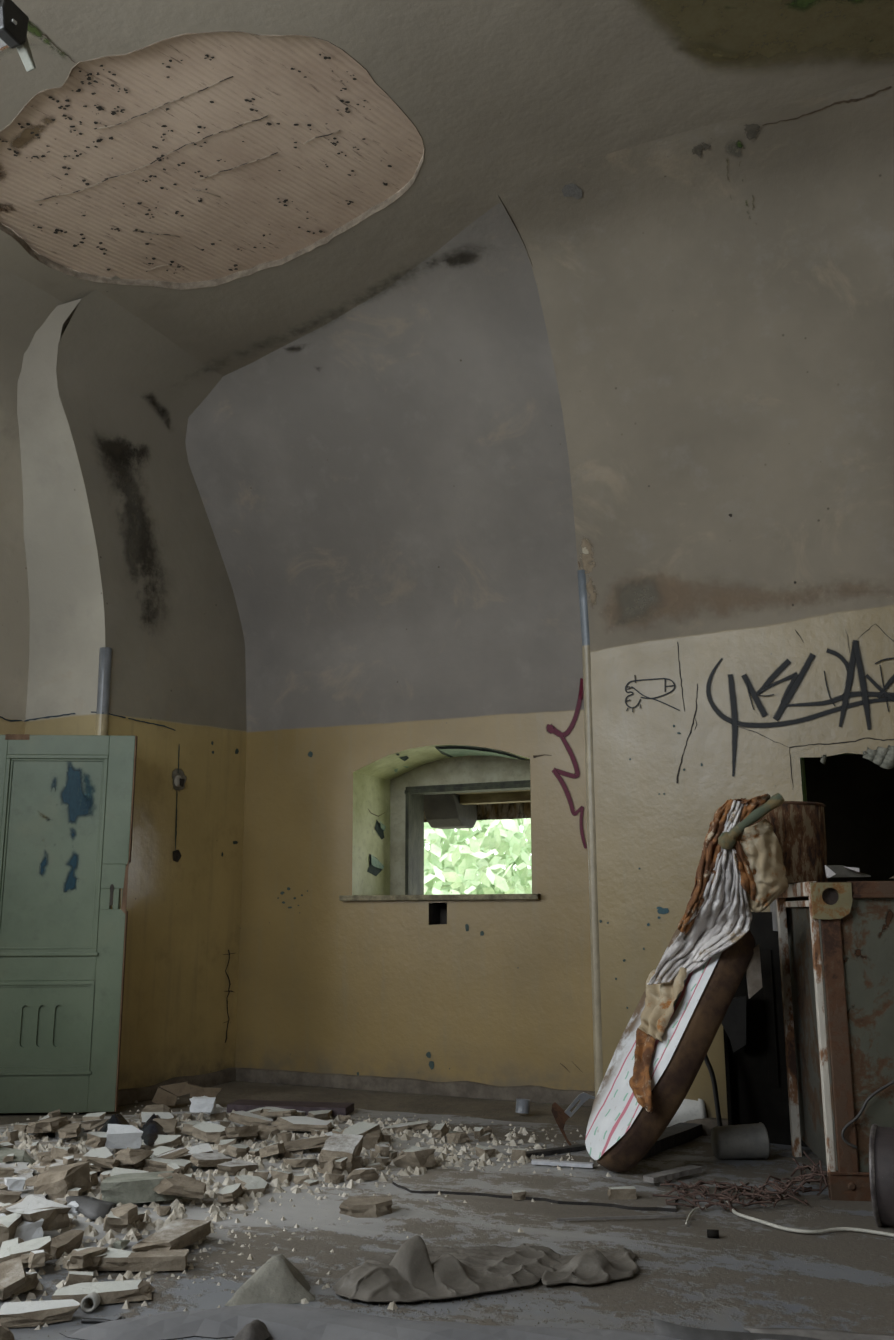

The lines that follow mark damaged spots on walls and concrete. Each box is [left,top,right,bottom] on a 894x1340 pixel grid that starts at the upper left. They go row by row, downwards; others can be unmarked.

flaking render [0,31,424,290]
water stain [98,438,158,623]